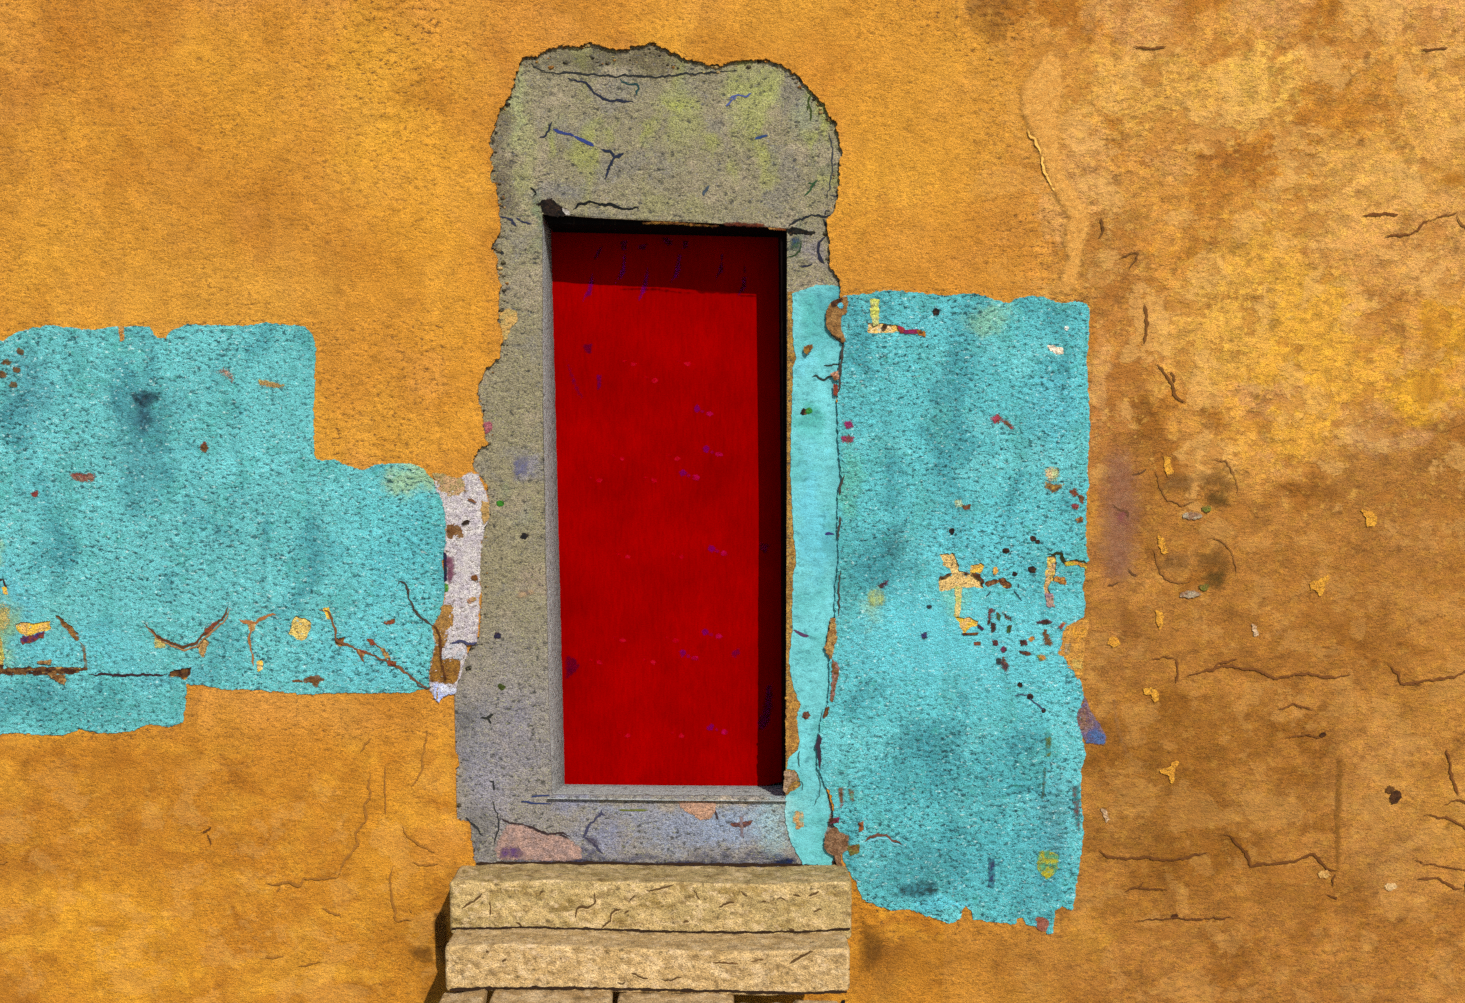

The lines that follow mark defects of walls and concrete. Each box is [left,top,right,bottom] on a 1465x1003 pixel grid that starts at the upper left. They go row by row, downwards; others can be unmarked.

spalling [490,43,837,373]
crack [1362,212,1465,237]
peeling [0,587,88,685]
crack [89,607,276,677]
crack [318,581,477,689]
flaking render [429,463,504,702]
peeling [927,536,1090,679]
peeling [783,618,840,793]
crack [1154,656,1350,738]
spalling [457,803,582,861]
crack [1099,834,1338,921]
crack [1424,750,1465,829]